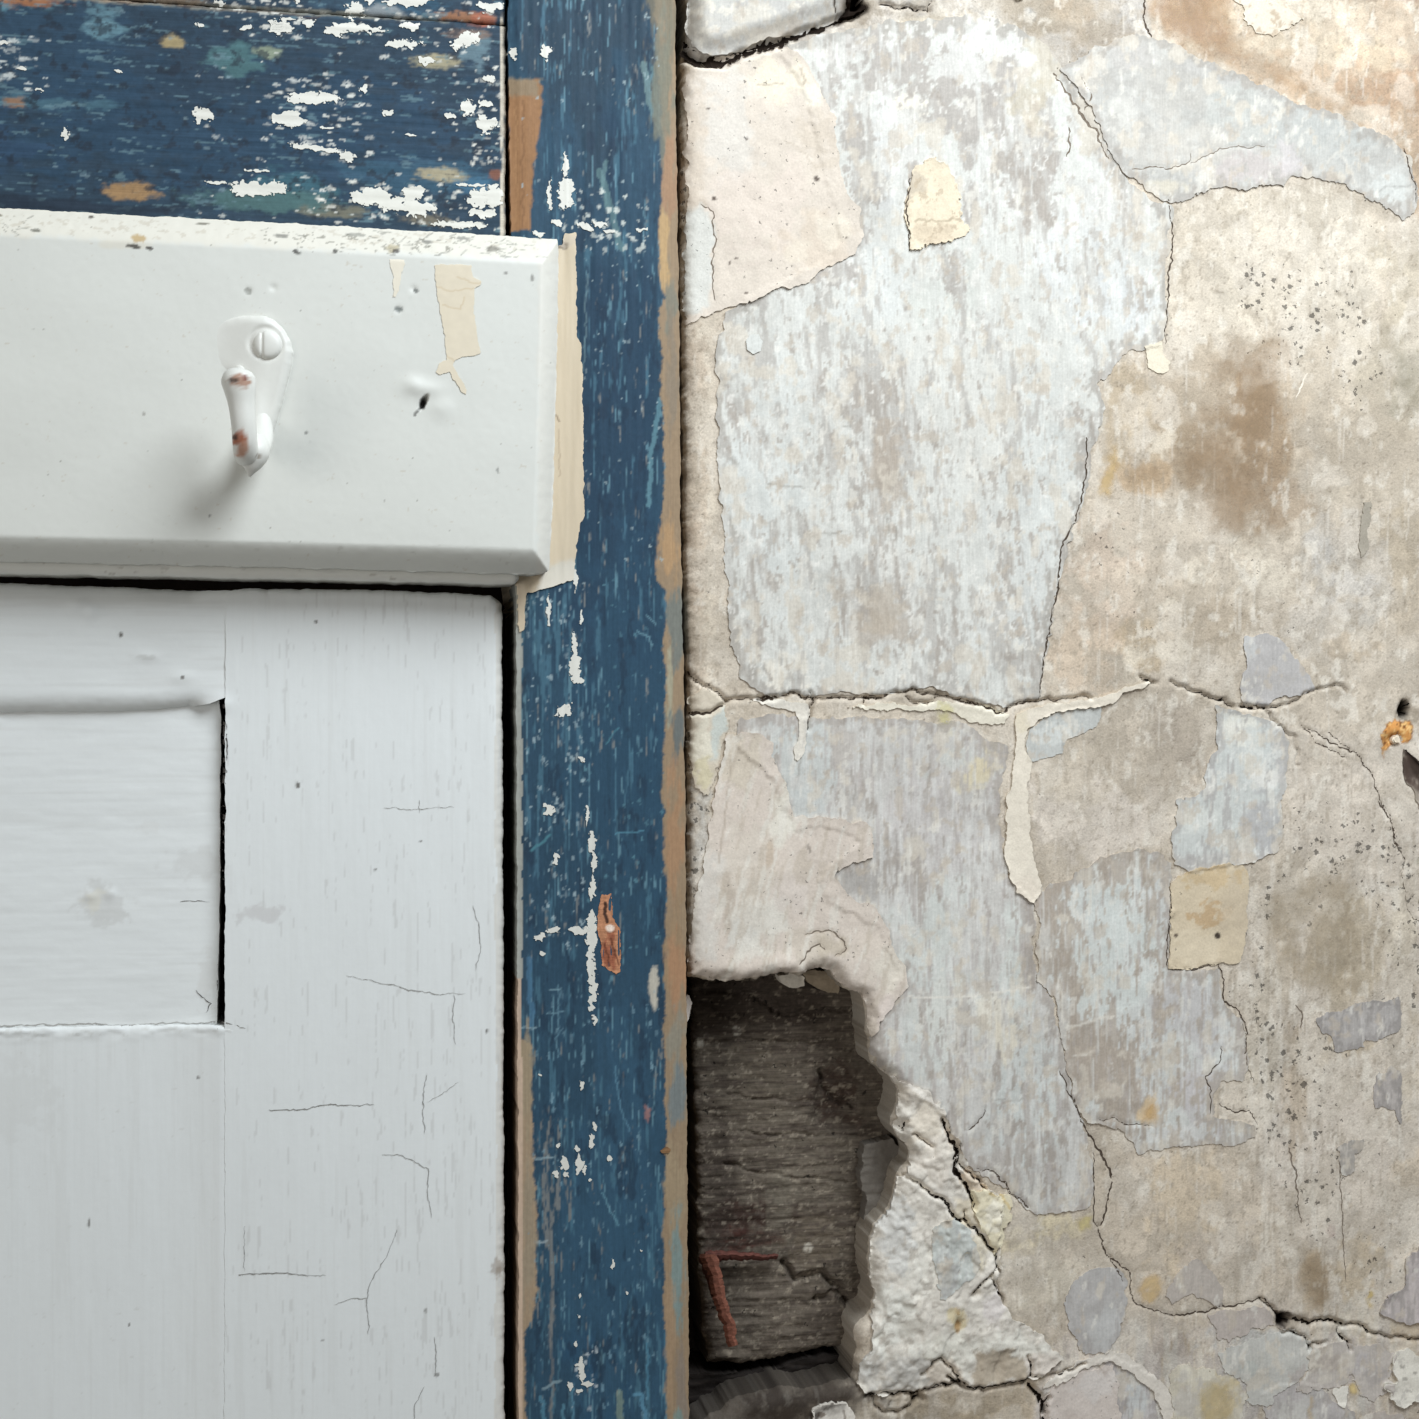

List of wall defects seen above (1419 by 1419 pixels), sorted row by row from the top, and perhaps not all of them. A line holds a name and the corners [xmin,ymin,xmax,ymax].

peeling [239,0,435,67]
crack [680,0,931,68]
peeling [272,91,357,163]
peeling [350,183,504,230]
peeling [532,152,615,238]
crack [687,437,1088,730]
peeling [681,0,1419,1419]
rust [1381,720,1413,751]
spalling [534,805,621,1026]
crack [898,1112,1028,1295]
crack [1059,1071,1419,1348]
crack [867,1357,1082,1419]